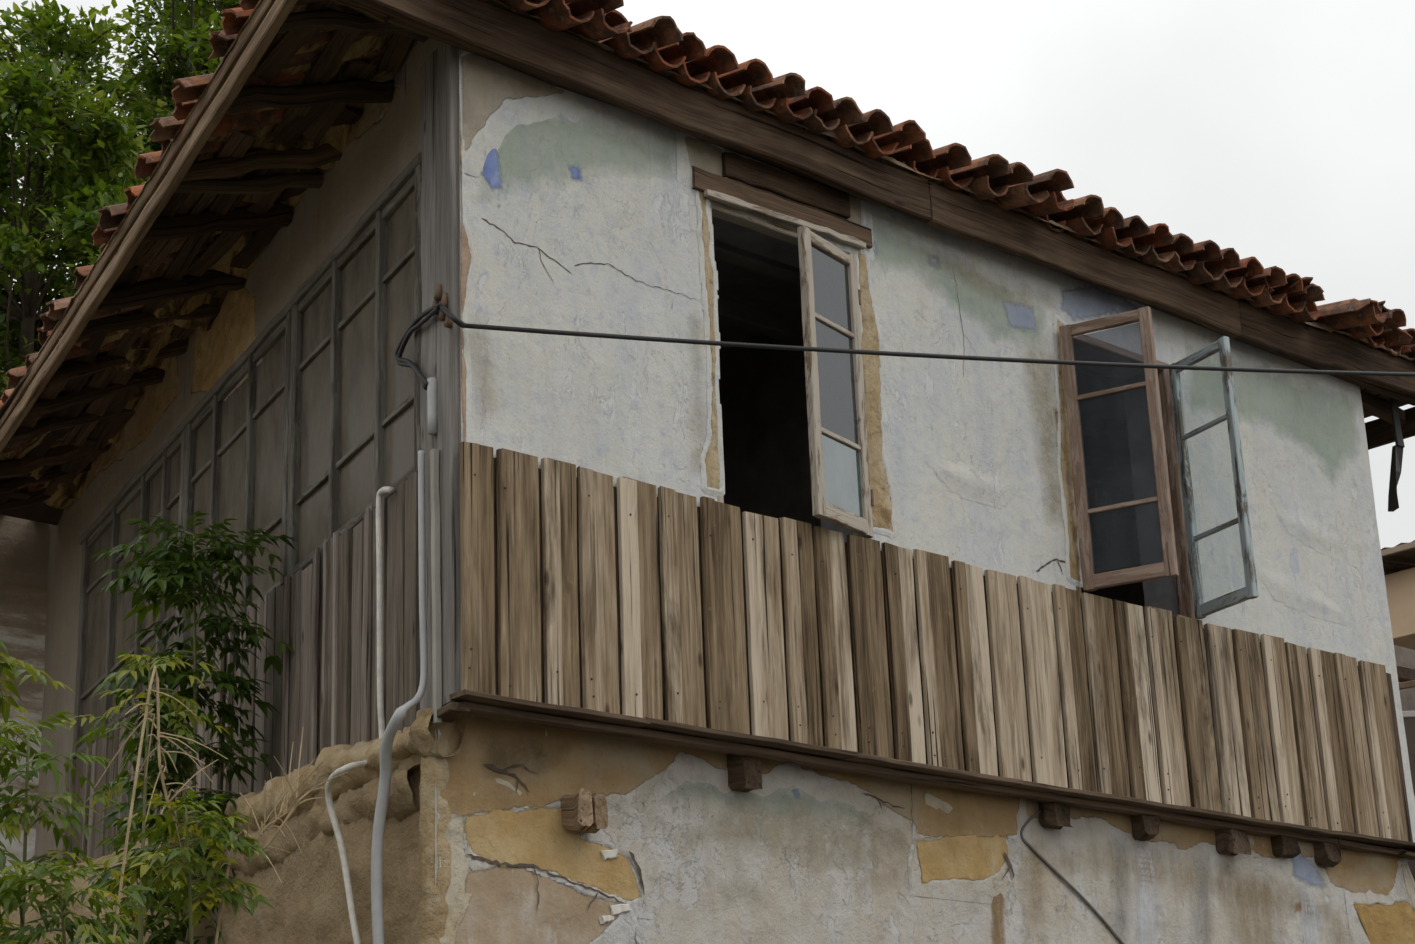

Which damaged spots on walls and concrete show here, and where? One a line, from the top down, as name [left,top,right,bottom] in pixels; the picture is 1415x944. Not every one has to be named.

crack [482,218,695,299]
spalling [818,196,897,539]
peeling [416,708,637,944]
crack [466,851,644,944]
spalling [1397,858,1415,909]